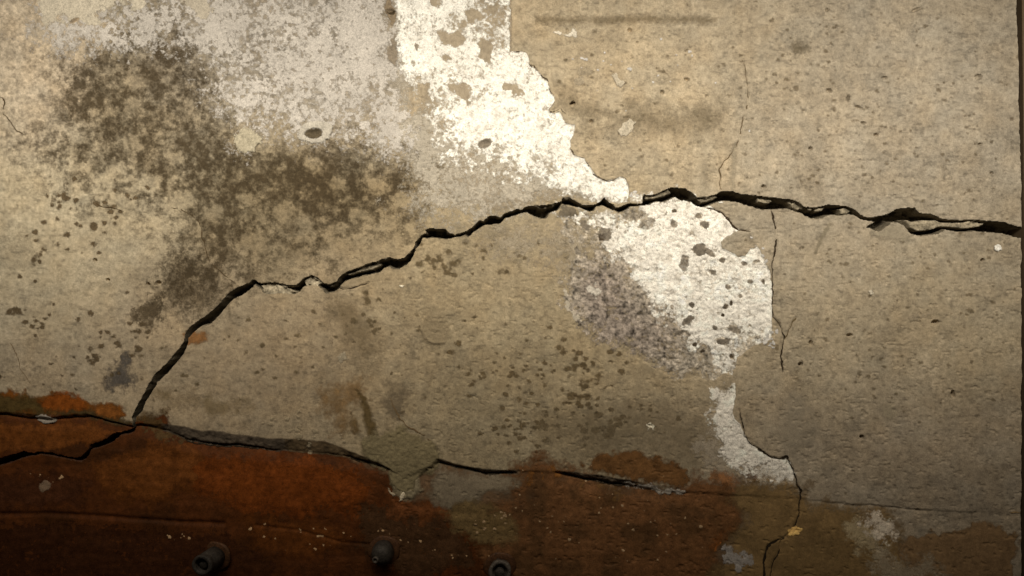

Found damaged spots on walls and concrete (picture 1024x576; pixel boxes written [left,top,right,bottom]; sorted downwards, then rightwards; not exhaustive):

water stain [7,303,55,337]
water stain [26,0,421,392]
water stain [416,244,460,277]
crack [0,65,1021,466]
spalling [384,0,778,381]
corrosion [0,383,756,576]
peeling [732,402,800,488]
crack [740,413,802,576]